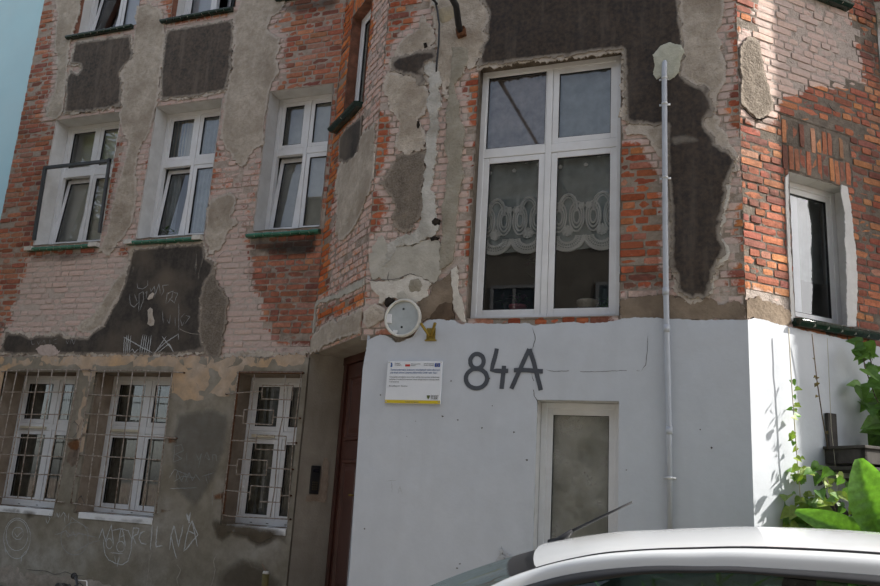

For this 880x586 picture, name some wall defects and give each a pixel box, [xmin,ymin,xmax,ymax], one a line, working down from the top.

peeling [36,344,60,357]
peeling [489,549,511,585]